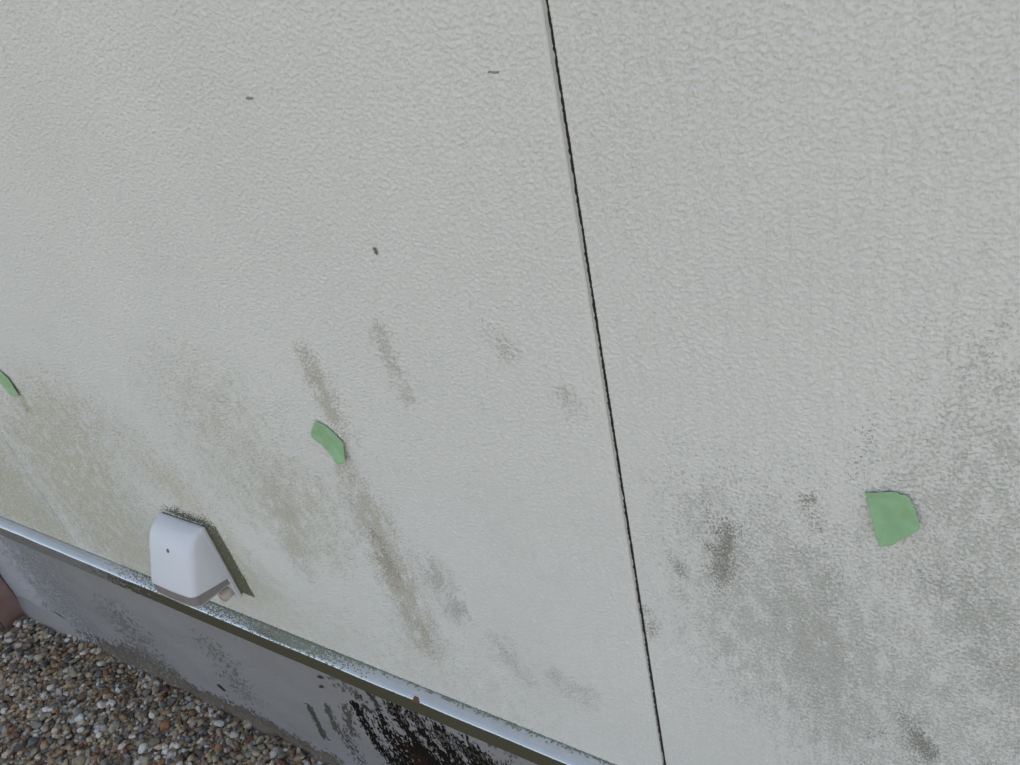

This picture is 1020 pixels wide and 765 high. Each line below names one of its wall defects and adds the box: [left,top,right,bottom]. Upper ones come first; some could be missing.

mould [668,501,751,601]
leakage [304,676,522,765]
mould [866,707,947,765]